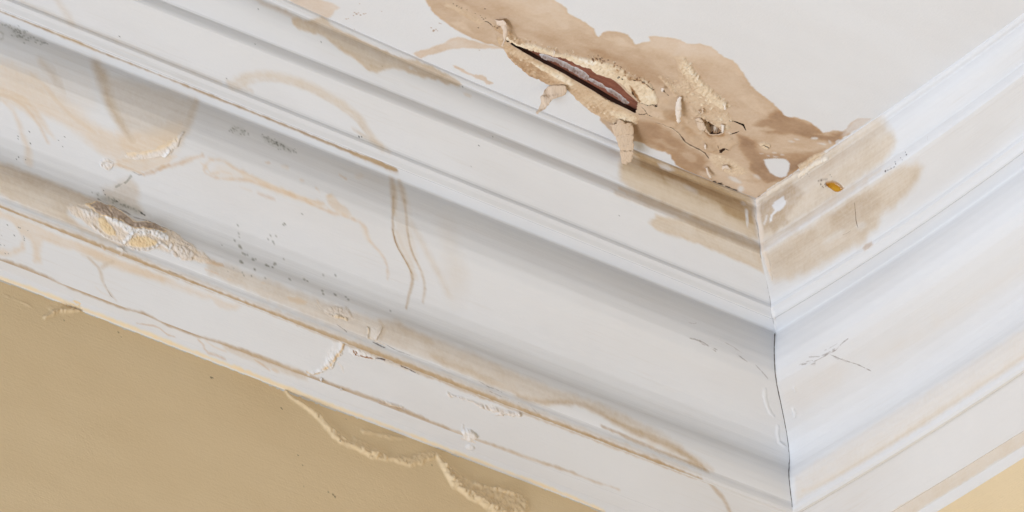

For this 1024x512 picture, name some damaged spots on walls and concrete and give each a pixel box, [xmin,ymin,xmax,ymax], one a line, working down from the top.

peeling [306,299,411,382]
water stain [0,0,733,512]
peeling [377,398,406,411]
water stain [252,0,927,288]
flaking render [443,1,750,178]
crack [688,197,872,508]